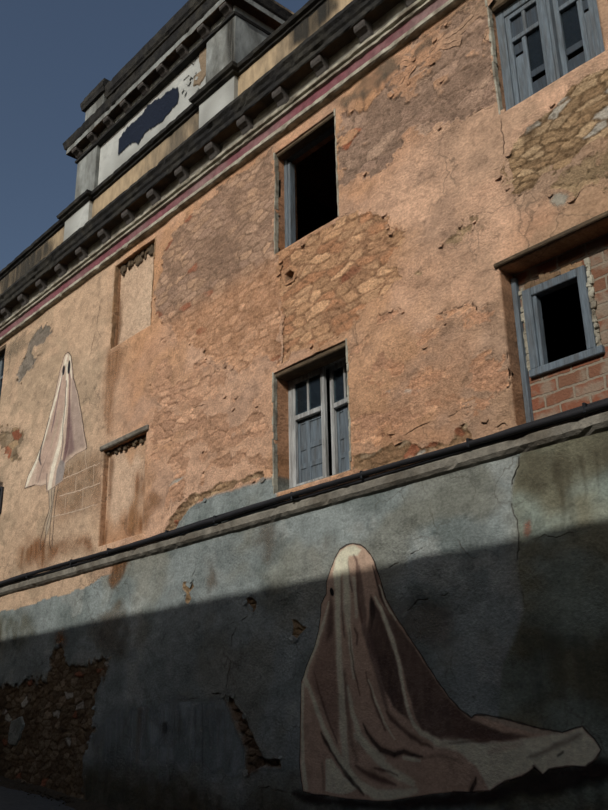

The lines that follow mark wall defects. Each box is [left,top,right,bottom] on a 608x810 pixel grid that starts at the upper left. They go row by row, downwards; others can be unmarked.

flaking render [336,0,497,192]
flaking render [533,141,608,218]
flaking render [15,321,52,387]
flaking render [107,143,510,533]
flaking render [0,421,29,465]
crack [504,452,584,622]
spalling [242,592,260,617]
spalling [0,640,113,803]
spalling [220,691,285,780]